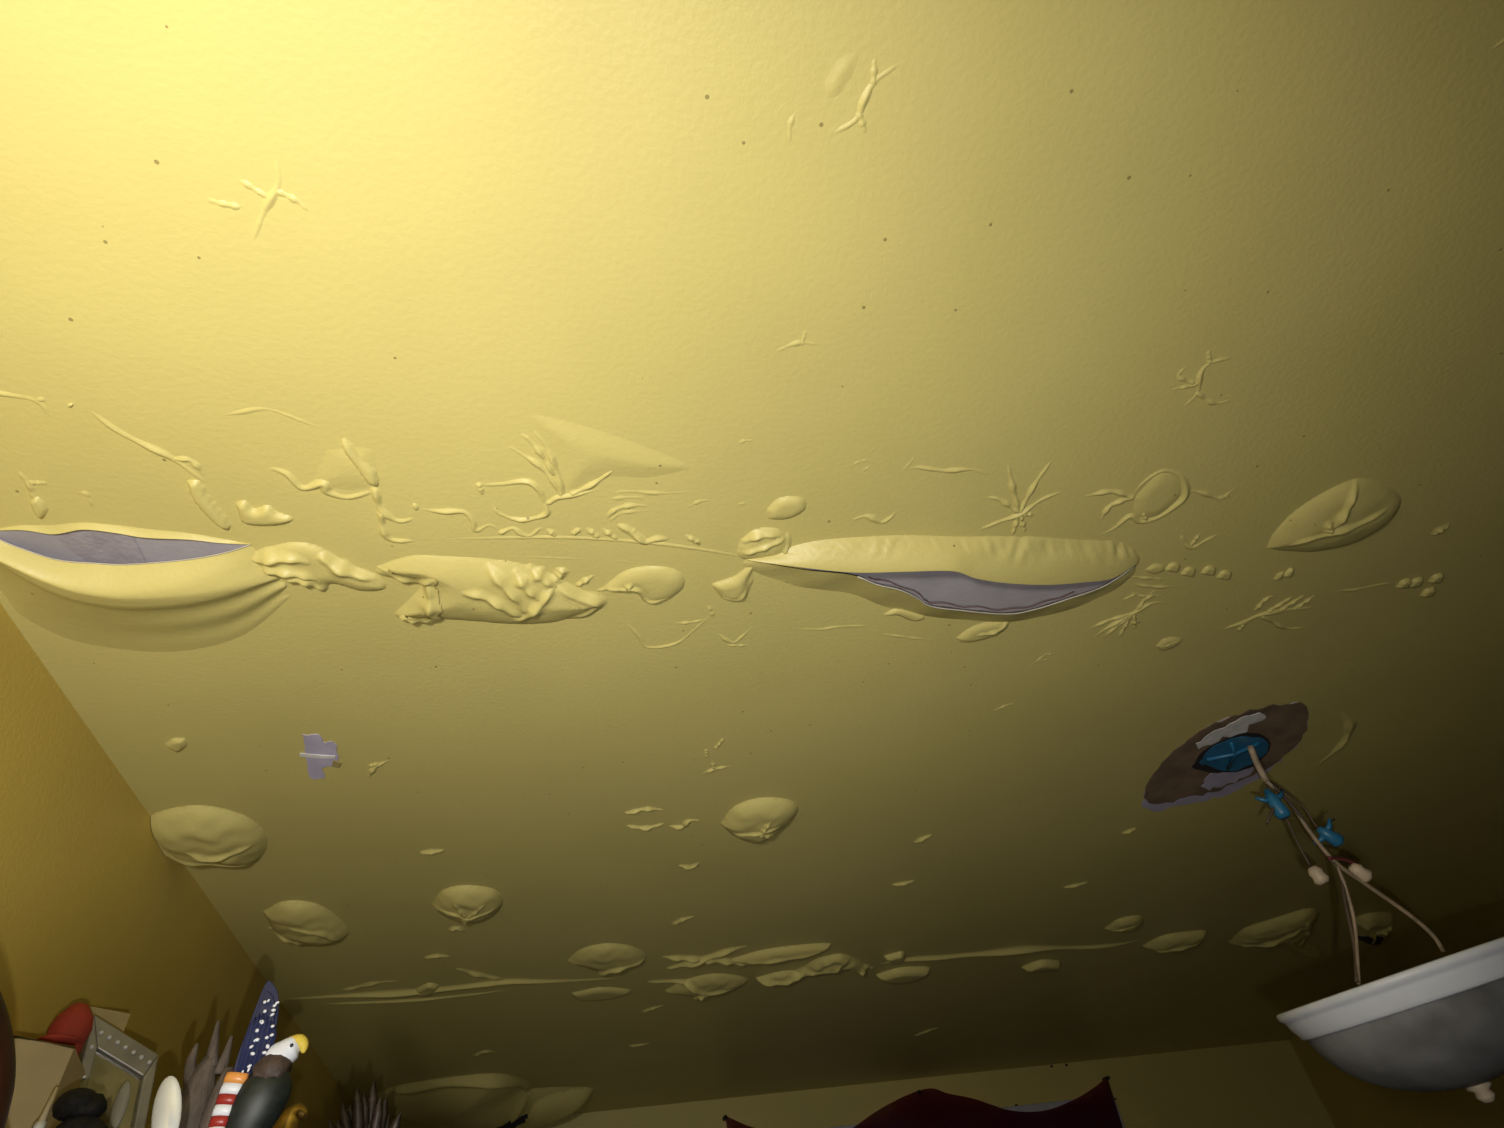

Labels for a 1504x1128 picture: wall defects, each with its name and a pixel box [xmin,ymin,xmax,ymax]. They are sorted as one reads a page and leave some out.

peeling [0,523,290,652]
peeling [743,535,1140,622]
peeling [300,734,341,780]